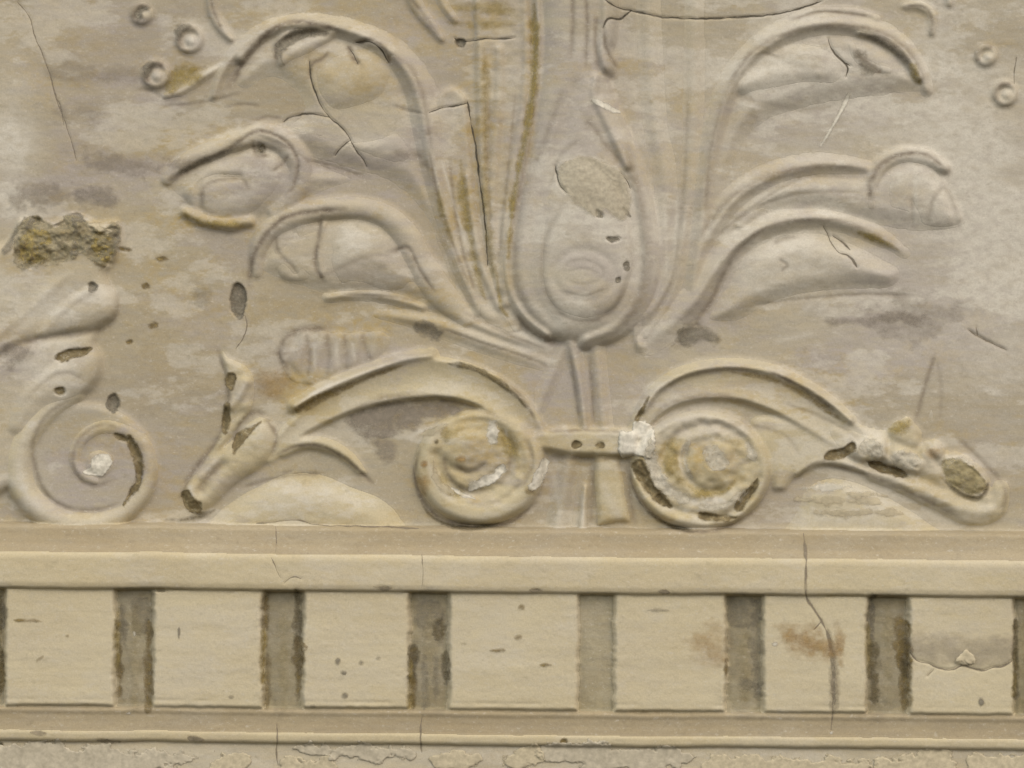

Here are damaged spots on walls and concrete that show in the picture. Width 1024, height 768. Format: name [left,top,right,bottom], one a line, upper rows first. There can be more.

crack [603,0,821,27]
crack [18,3,77,161]
crack [284,61,367,166]
crack [429,102,488,266]
spalling [2,215,130,269]
spalling [115,433,143,506]
spalling [181,490,202,514]
spalling [222,403,261,454]
spalling [631,438,758,521]
spalling [824,439,921,478]
spalling [943,458,986,494]
crack [803,533,835,727]